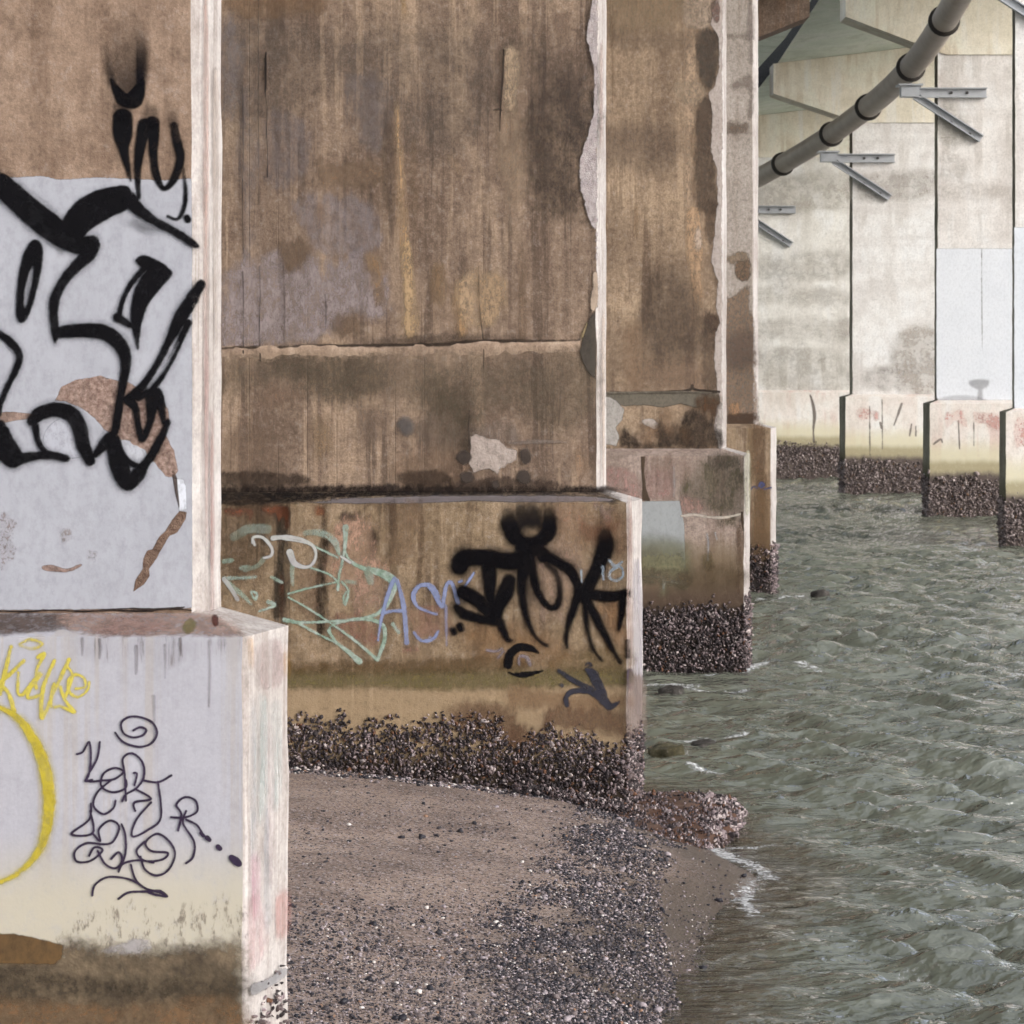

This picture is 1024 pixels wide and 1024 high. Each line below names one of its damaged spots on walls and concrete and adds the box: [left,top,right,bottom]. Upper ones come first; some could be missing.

spalling [0,412,30,422]
spalling [43,419,81,458]
spalling [56,376,187,591]
crack [222,4,580,369]
peeling [579,0,599,311]
water stain [606,0,770,593]
peeling [709,0,759,449]
water stain [0,941,249,1024]